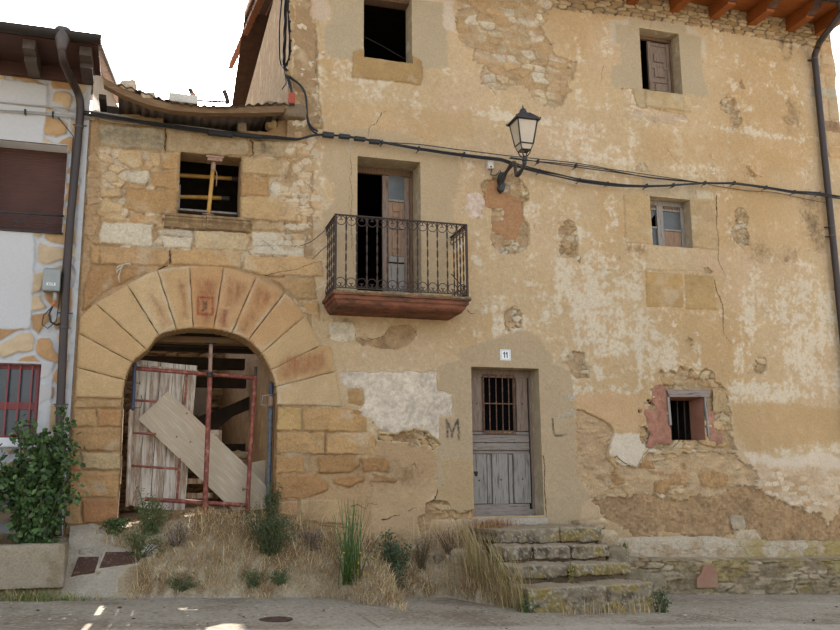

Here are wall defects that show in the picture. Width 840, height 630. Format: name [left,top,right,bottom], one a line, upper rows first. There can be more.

flaking render [453,0,577,109]
flaking render [621,89,689,123]
flaking render [719,94,743,130]
flaking render [462,172,529,255]
flaking render [558,221,580,262]
flaking render [727,208,752,245]
flaking render [504,305,524,332]
flaking render [562,351,593,379]
flaking render [752,355,766,374]
peeling [340,369,453,450]
flaking render [576,366,840,541]
flaking render [416,500,473,536]